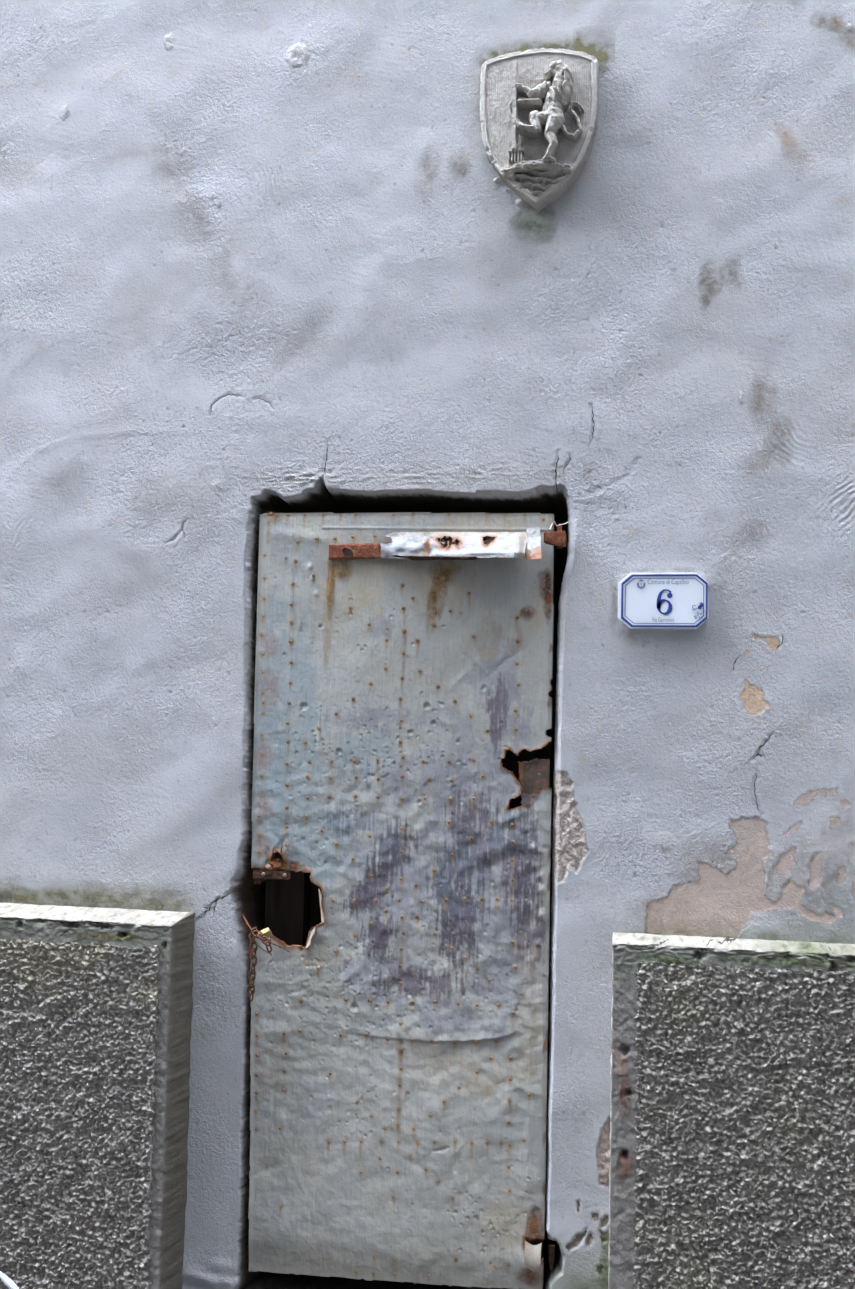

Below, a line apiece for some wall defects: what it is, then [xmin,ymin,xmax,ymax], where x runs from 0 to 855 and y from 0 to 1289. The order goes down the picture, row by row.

corrosion [438,536,459,548]
peeling [744,633,780,656]
peeling [739,680,770,715]
spalling [553,770,588,883]
peeling [645,788,855,938]